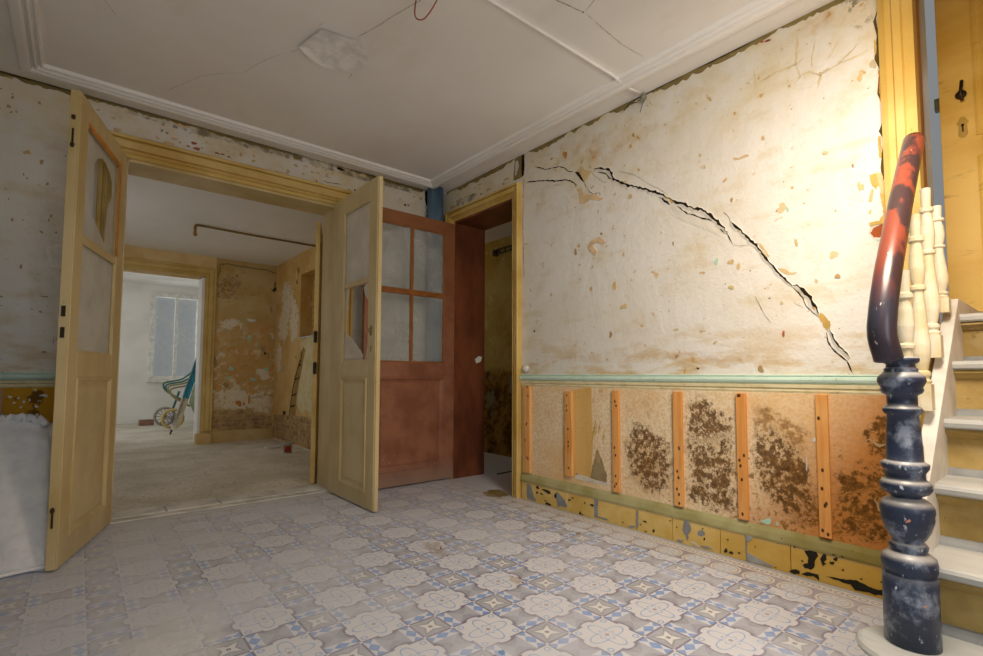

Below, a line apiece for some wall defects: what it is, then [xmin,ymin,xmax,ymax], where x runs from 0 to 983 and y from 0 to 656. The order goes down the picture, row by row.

crack [557,0,642,56]
peeling [857,171,886,241]
crack [527,166,852,372]
peeling [276,267,313,419]
peeling [526,484,573,508]
spalling [575,450,609,485]
damp [623,420,674,502]
damp [684,393,738,514]
damp [750,404,819,527]
damp [833,414,891,549]
peeling [669,520,777,568]
peeling [790,546,882,595]